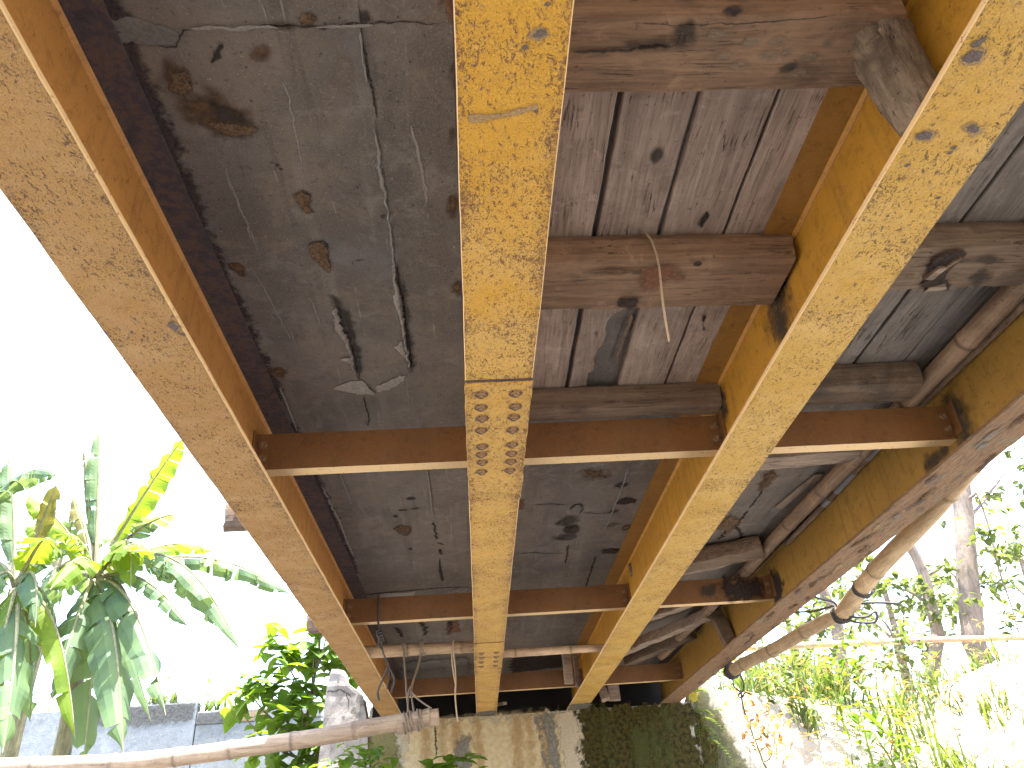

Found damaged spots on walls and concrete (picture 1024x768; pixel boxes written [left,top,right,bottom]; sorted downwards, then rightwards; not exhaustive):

crack [153,4,437,275]
spalling [293,191,313,214]
spalling [308,241,331,273]